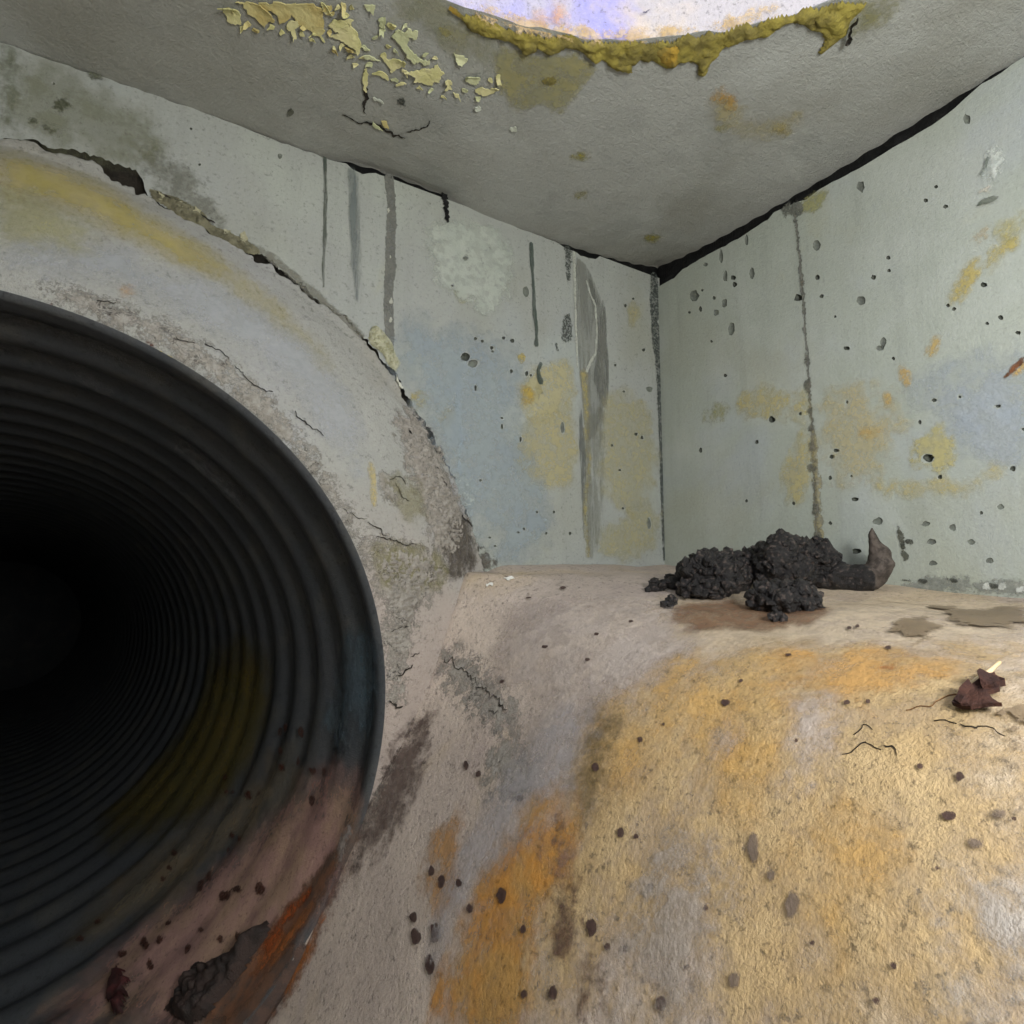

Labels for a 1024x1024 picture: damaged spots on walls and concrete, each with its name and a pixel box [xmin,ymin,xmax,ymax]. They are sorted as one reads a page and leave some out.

peeling [217,1,502,112]
crack [343,88,430,138]
crack [4,138,215,234]
water stain [349,170,357,298]
crack [176,337,273,392]
crack [246,253,455,486]
water stain [368,173,609,578]
crack [444,656,507,714]
corrosion [256,882,339,1024]